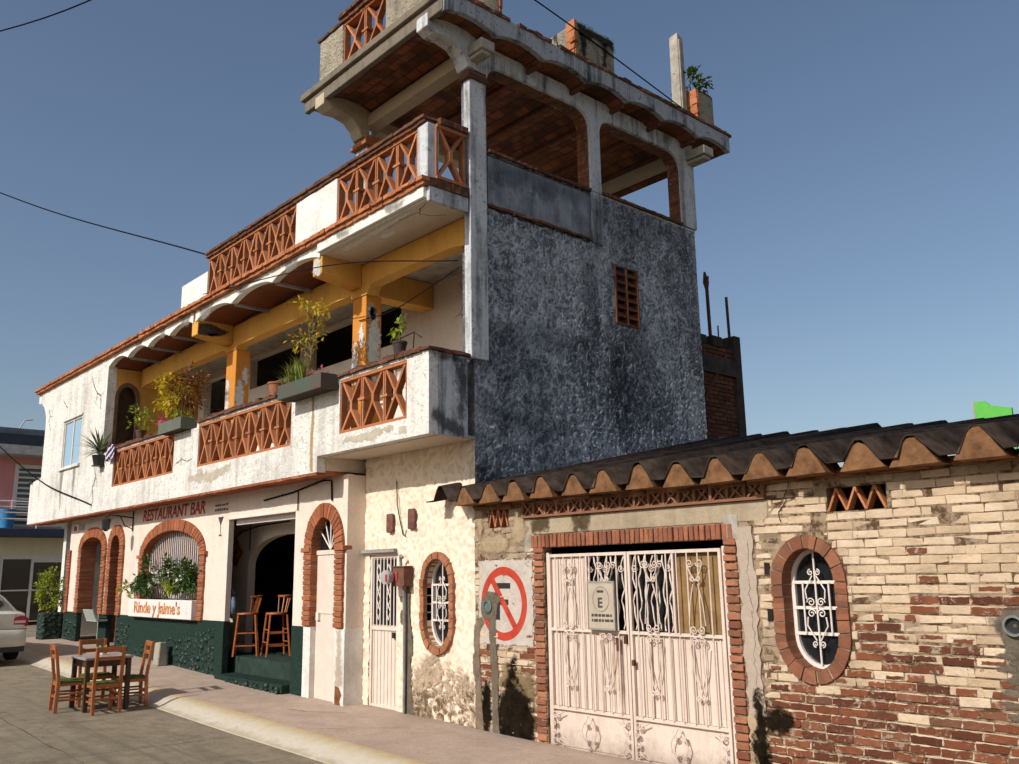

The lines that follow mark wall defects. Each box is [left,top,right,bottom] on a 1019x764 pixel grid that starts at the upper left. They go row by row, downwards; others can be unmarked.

peeling [352,303,382,368]
spalling [475,510,528,555]
leakage [482,655,536,741]
flaking render [766,586,1019,764]